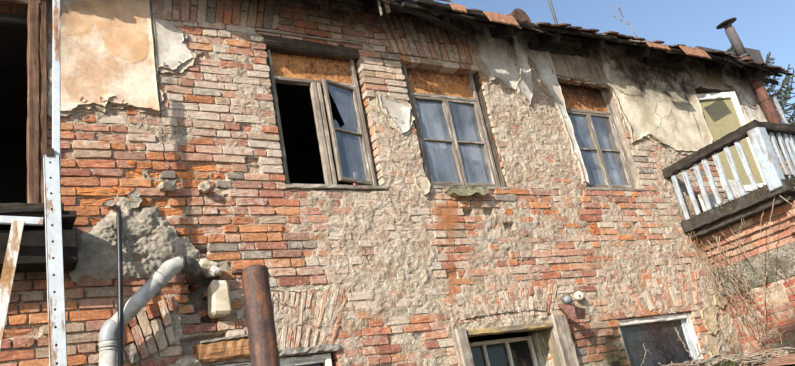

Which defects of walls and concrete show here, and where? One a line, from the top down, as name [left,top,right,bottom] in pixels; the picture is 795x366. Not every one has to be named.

peeling [47,0,197,118]
peeling [373,90,415,137]
peeling [470,23,713,187]
crack [596,62,701,136]
peeling [101,186,142,209]